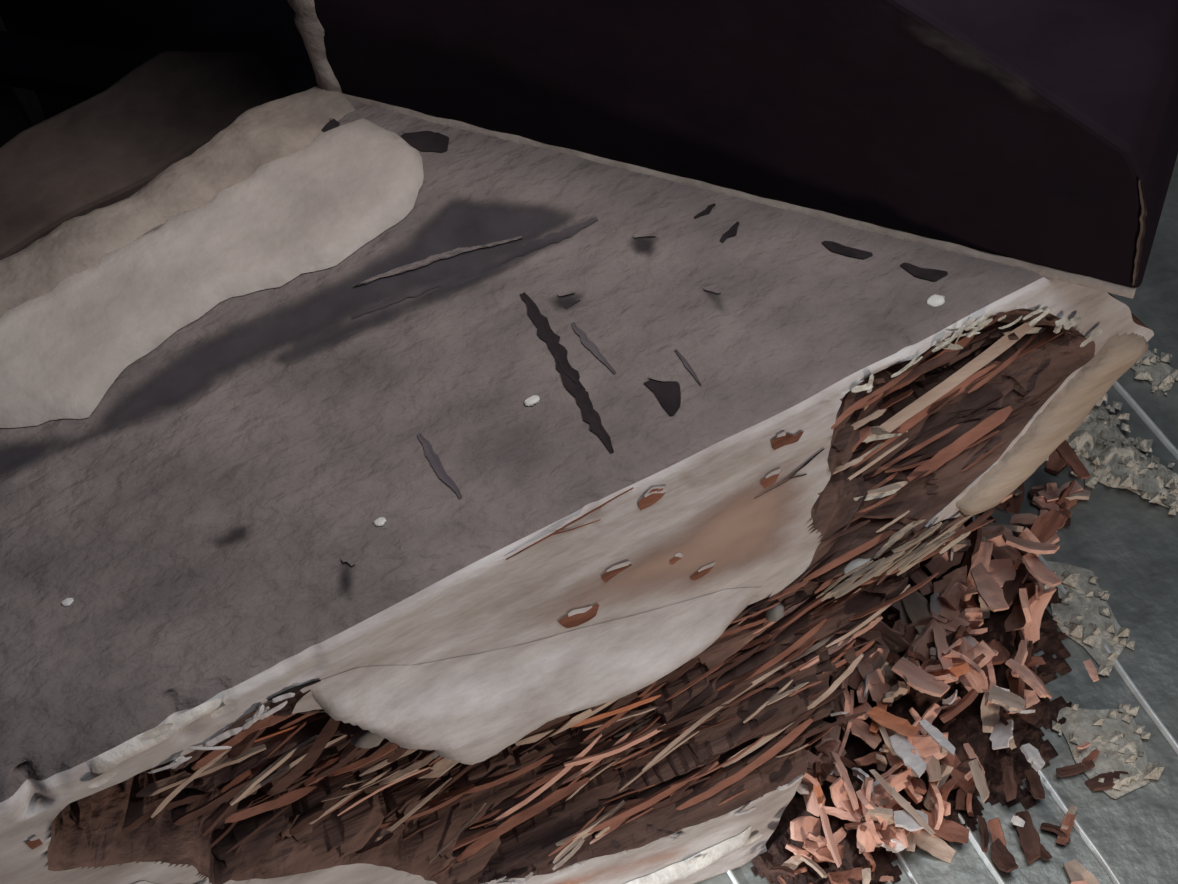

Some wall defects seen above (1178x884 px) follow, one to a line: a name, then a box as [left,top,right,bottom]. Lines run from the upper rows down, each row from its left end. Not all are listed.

damp [0,201,569,474]
crack [520,292,616,453]
crack [417,434,462,499]
spalling [25,308,1104,884]
crack [506,487,633,560]